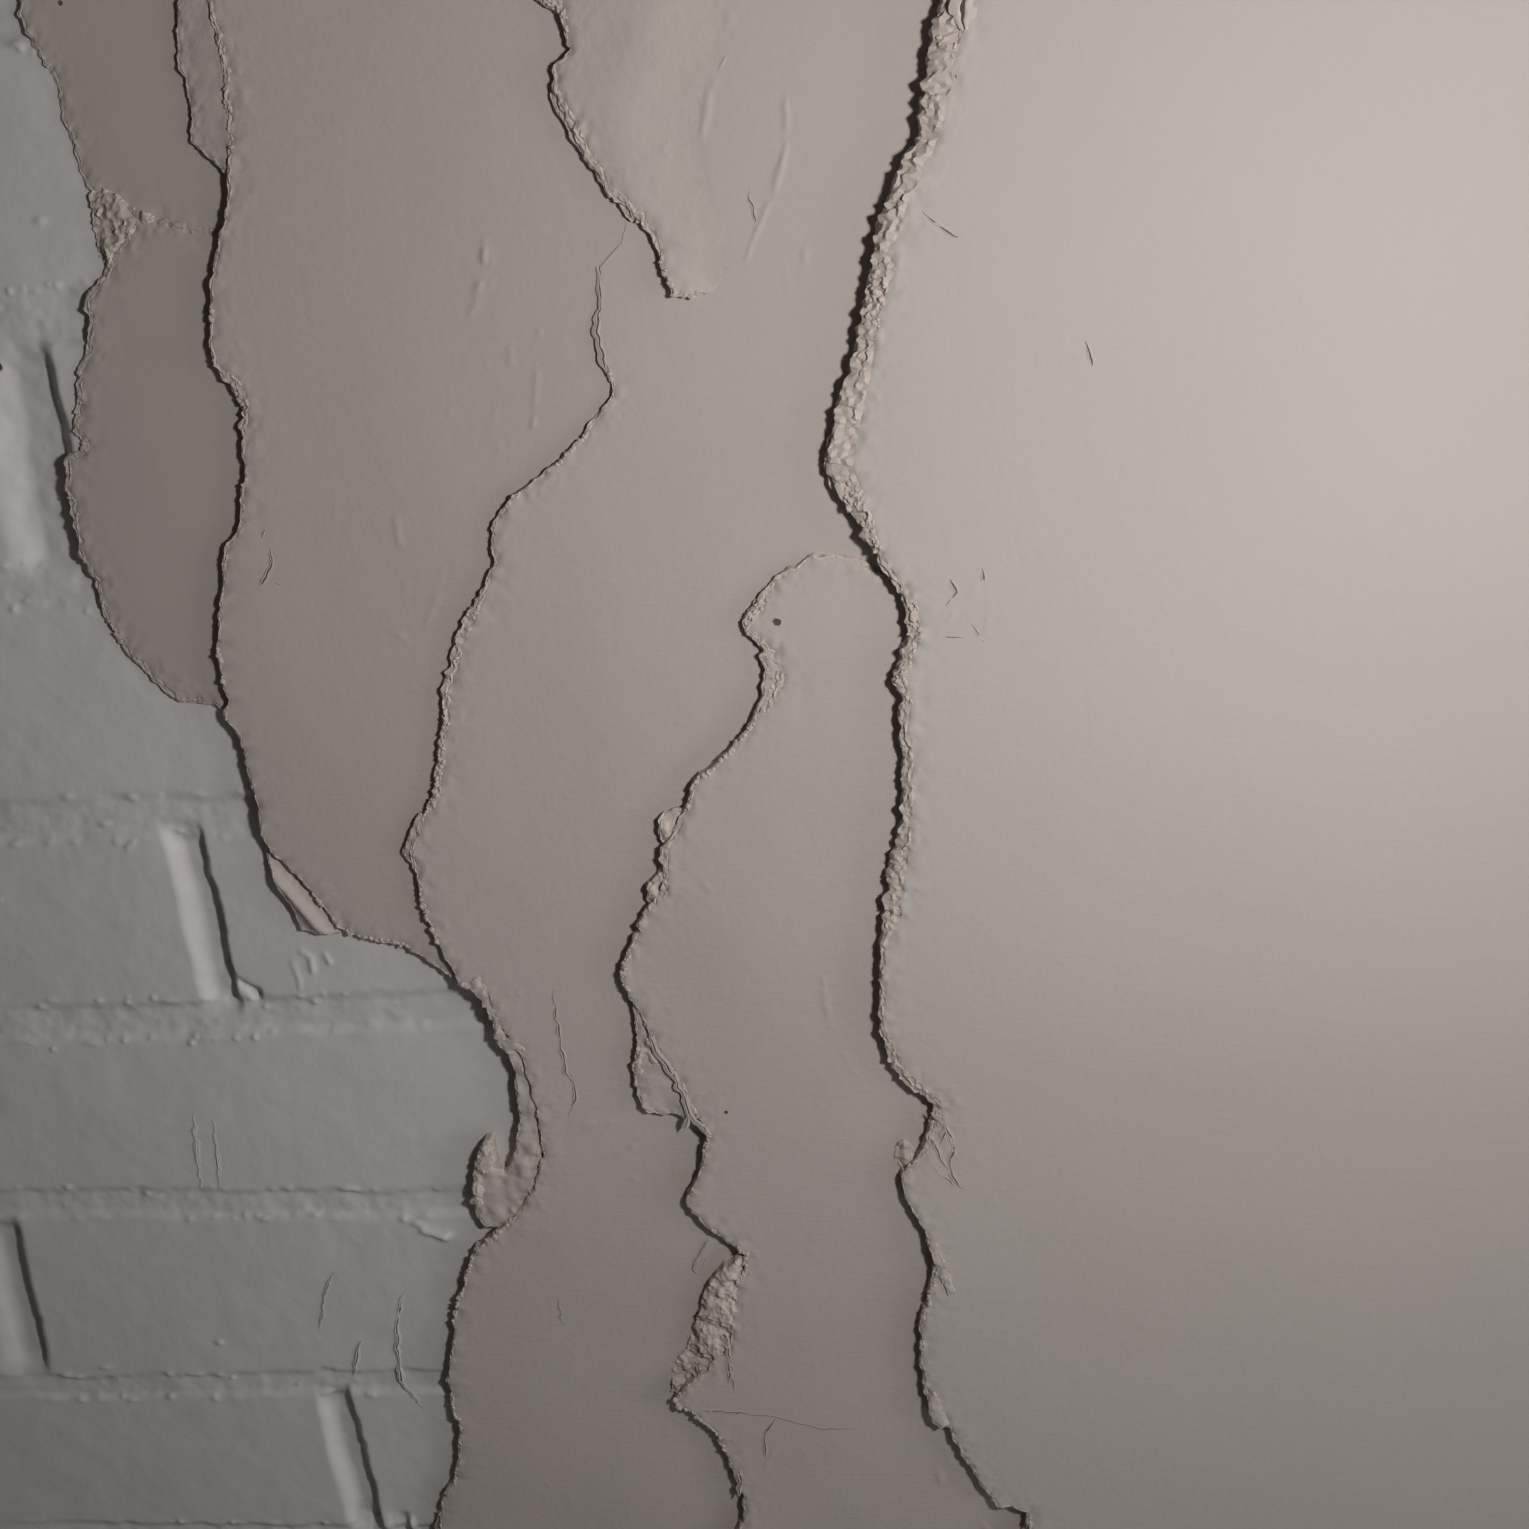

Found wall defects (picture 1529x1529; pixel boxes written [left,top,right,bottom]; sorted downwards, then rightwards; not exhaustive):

flaking render [17,0,1025,1529]
flaking render [824,0,1529,1529]